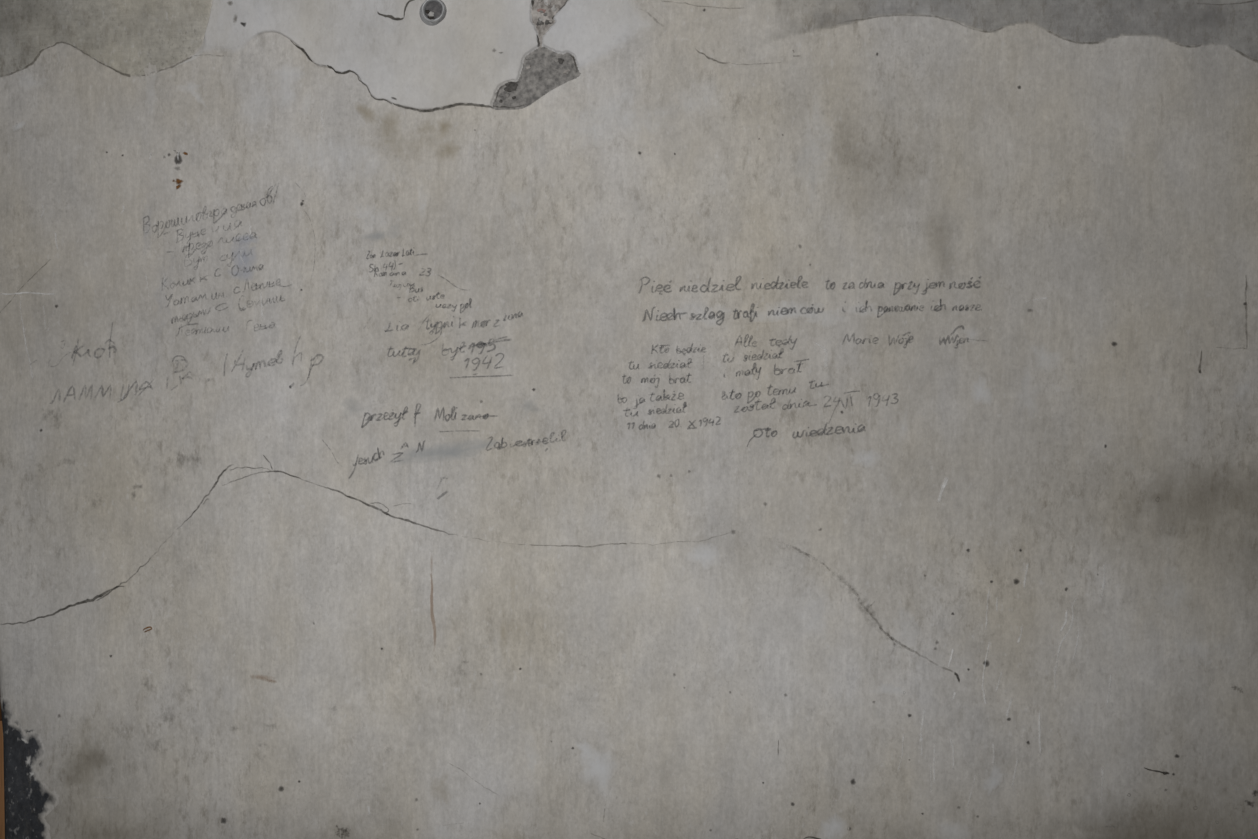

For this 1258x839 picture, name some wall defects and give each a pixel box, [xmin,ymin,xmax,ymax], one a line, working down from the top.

flaking render [491,0,581,110]
crack [338,491,431,529]
crack [10,586,122,625]
peeling [0,686,60,839]